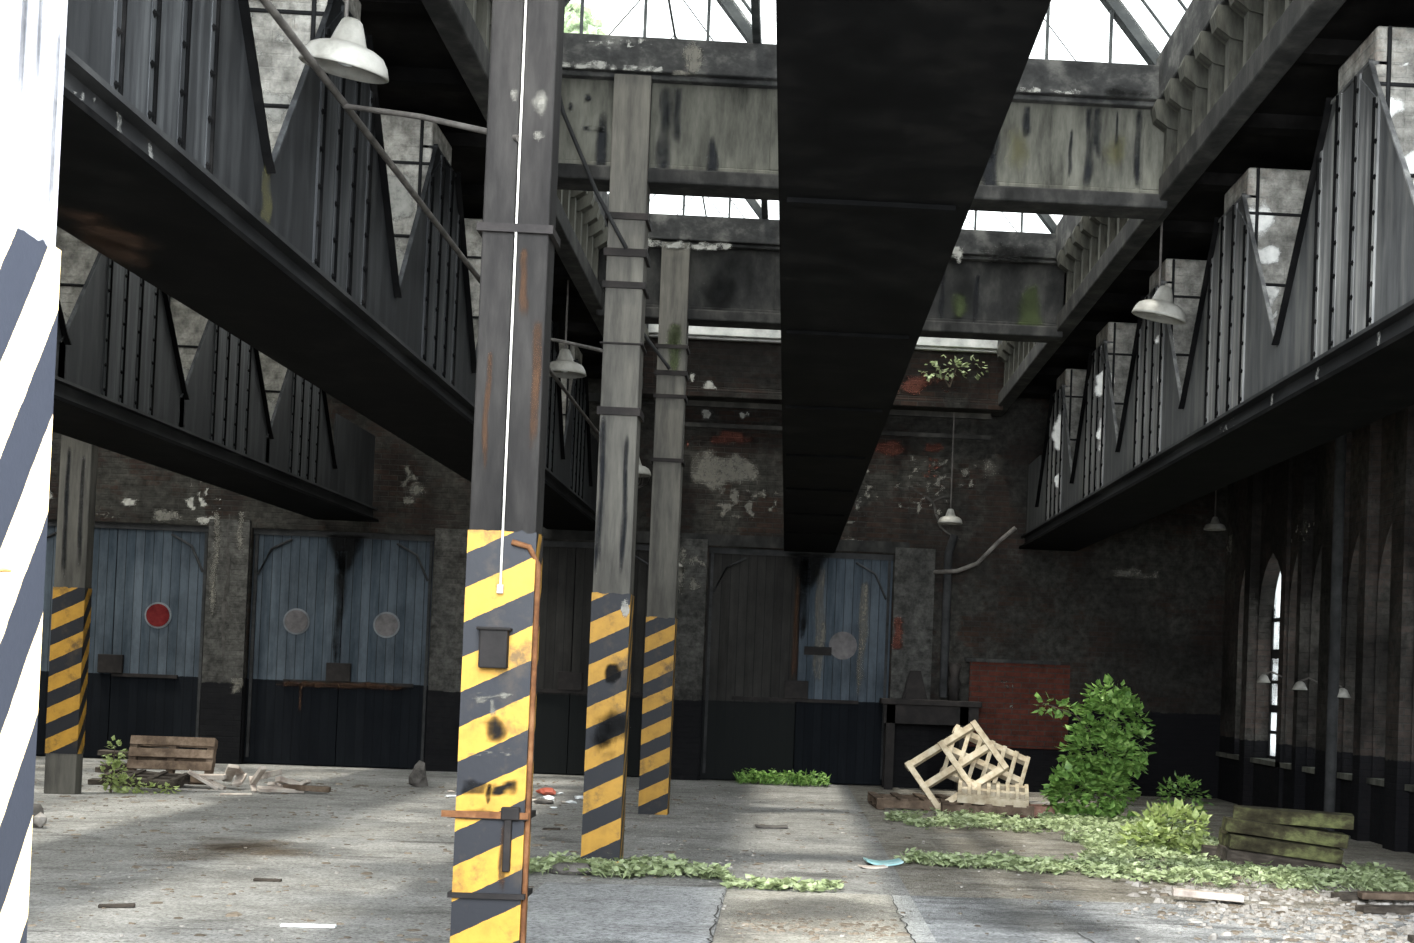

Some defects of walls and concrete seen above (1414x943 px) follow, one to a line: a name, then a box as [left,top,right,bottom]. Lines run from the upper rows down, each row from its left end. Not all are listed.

leakage [562,38,662,72]
leakage [583,117,607,165]
leakage [657,89,681,168]
leakage [707,140,718,171]
leakage [984,138,999,185]
leakage [1020,87,1041,133]
leakage [1068,109,1118,183]
peeling [154,481,220,524]
peeling [691,451,779,518]
peeling [844,469,878,540]
peeling [896,455,992,515]